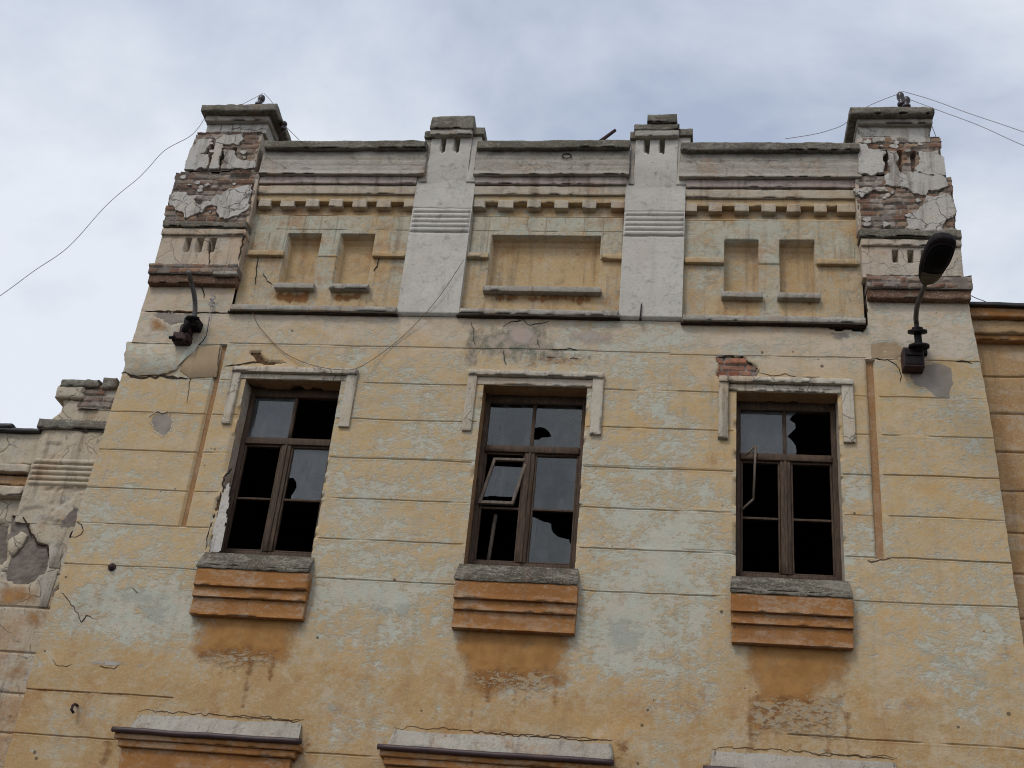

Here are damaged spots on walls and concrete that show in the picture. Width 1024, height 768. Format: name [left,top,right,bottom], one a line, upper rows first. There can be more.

flaking render [164,131,262,223]
flaking render [853,136,957,230]
flaking render [251,353,280,365]
flaking render [716,355,759,378]
flaking render [60,508,78,529]
flaking render [210,483,230,552]
flaking render [0,515,64,608]